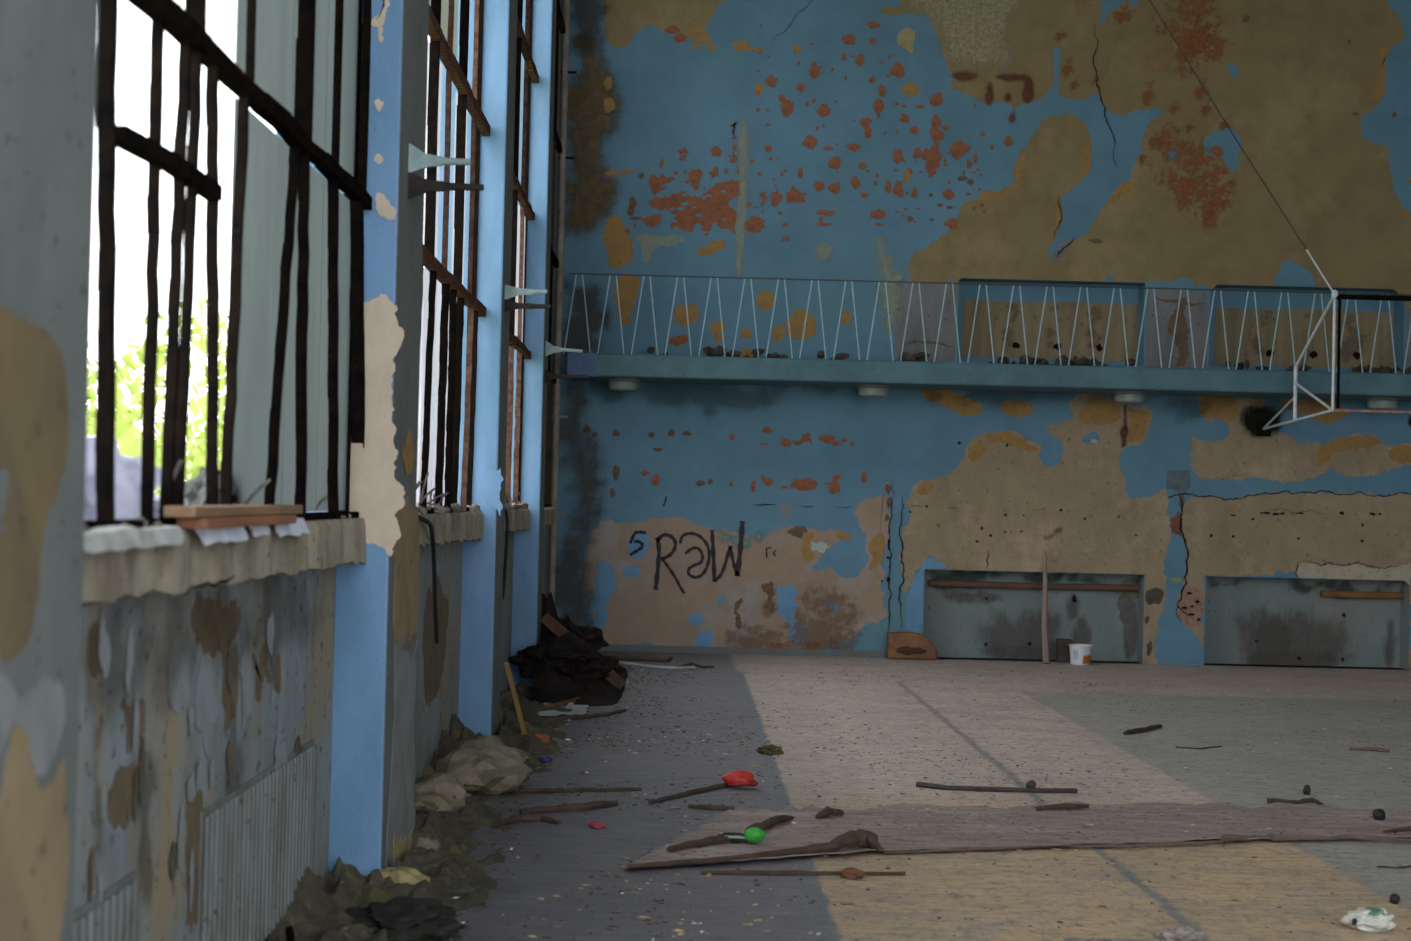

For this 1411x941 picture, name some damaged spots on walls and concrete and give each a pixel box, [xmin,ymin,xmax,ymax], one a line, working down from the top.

peeling [375,192,396,220]
leakage [565,0,634,233]
peeling [602,0,1411,369]
crack [1091,24,1116,165]
corrosion [1140,79,1234,228]
peeling [919,389,982,417]
peeling [349,294,449,867]
peeling [582,394,1411,664]